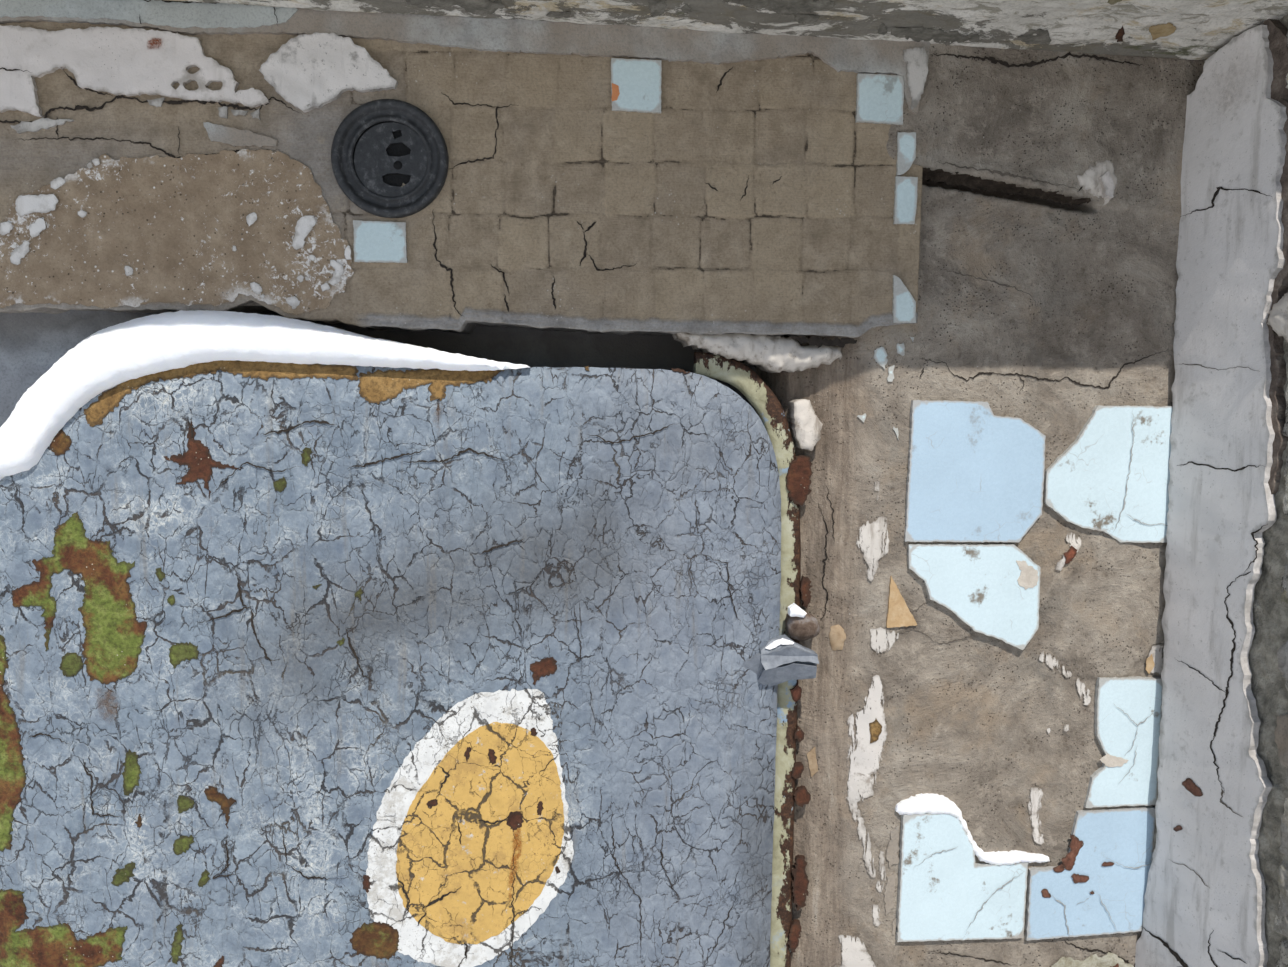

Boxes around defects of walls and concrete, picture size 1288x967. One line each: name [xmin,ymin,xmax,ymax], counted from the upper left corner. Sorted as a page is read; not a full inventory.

peeling [0,25,398,148]
crack [922,161,1091,206]
peeling [0,177,65,265]
crack [920,351,1260,391]
corrosion [163,421,244,498]
corrosion [786,455,812,506]
crack [1174,525,1266,817]
peeling [846,675,900,935]
corrosion [1053,835,1094,894]
crack [397,874,462,926]
corrosion [349,921,399,961]
peeling [839,934,876,967]